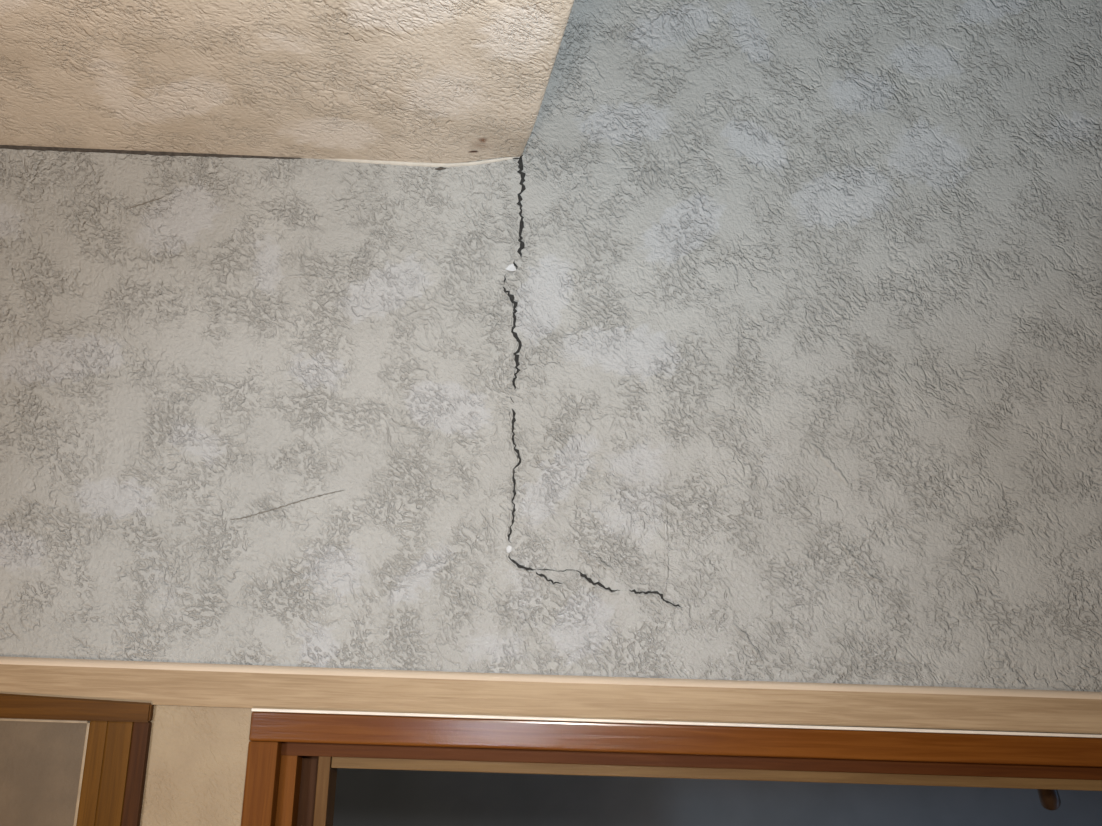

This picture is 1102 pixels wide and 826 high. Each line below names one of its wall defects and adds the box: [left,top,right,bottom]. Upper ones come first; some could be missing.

crack [501,155,683,610]